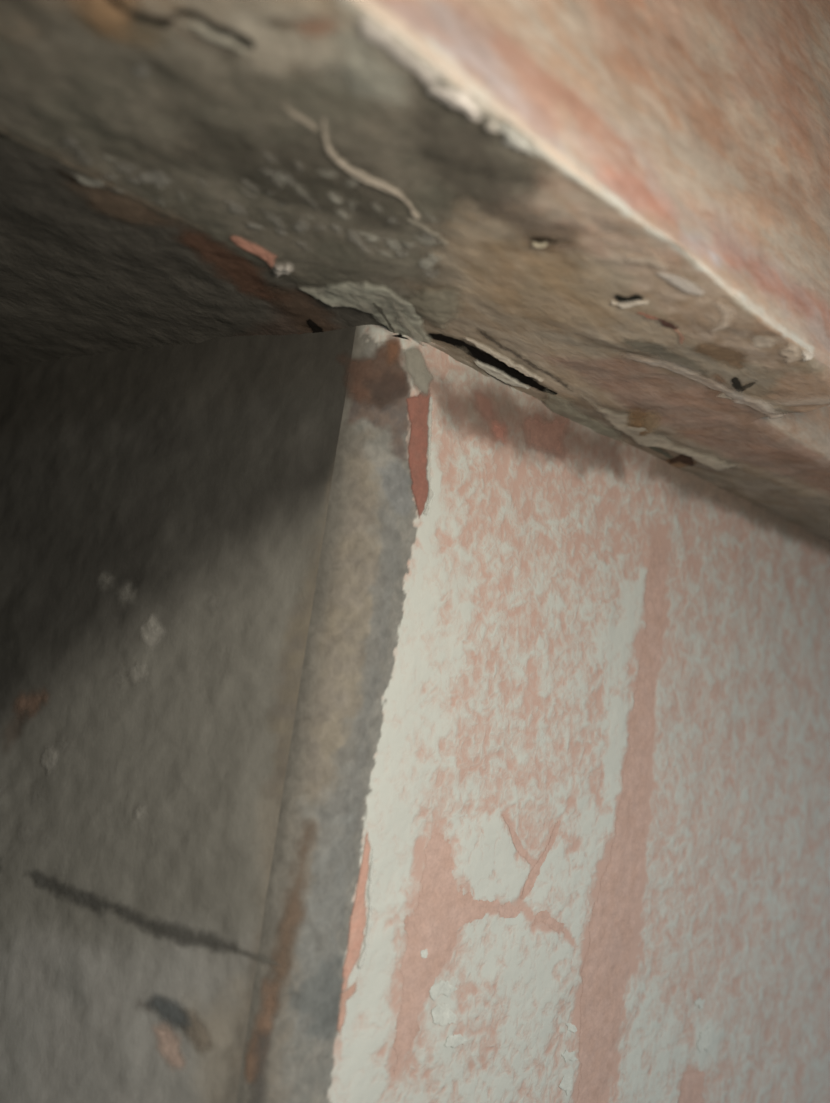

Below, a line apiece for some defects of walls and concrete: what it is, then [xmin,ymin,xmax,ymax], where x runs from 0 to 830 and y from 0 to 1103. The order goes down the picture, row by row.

crack [110,0,254,54]
leakage [0,0,568,300]
spalling [611,294,648,309]
peeling [629,258,703,295]
crack [372,303,572,395]
spalling [718,377,756,399]
peeling [407,390,433,516]
peeling [559,537,667,1103]
crack [32,873,272,963]
peeling [338,833,373,1032]
peeling [393,814,564,1075]